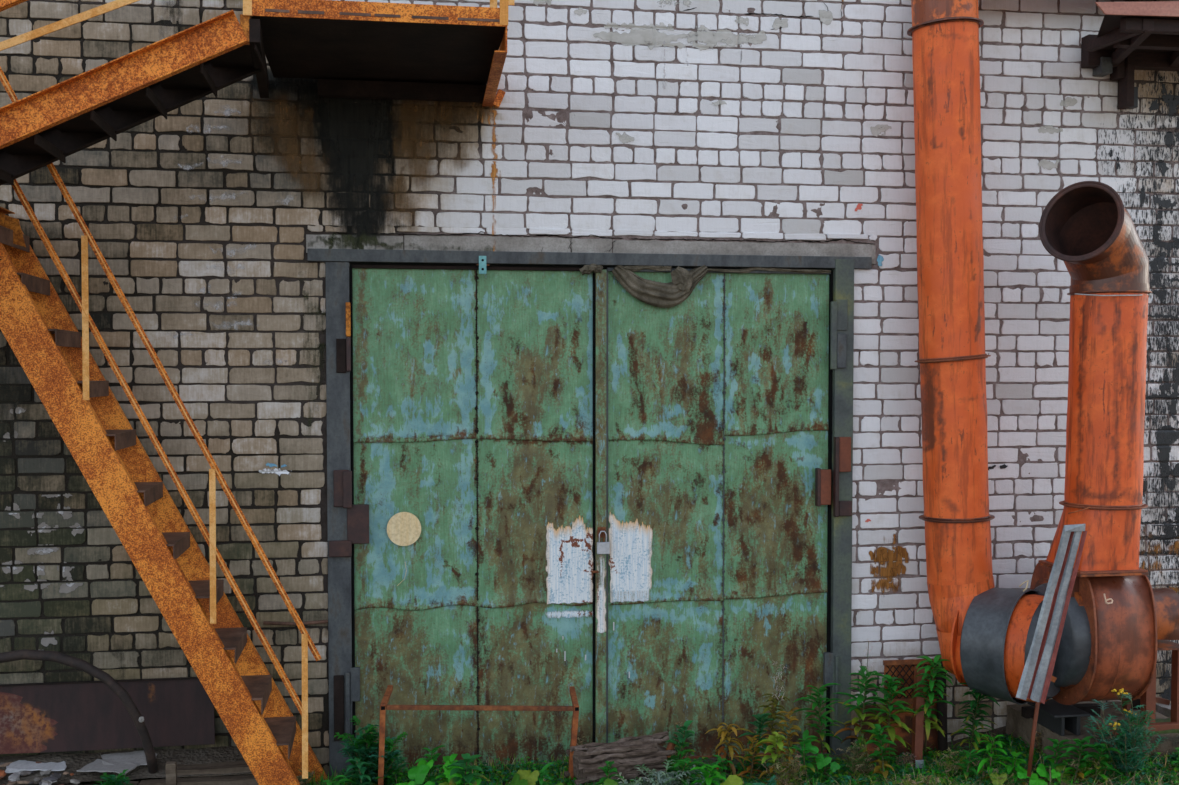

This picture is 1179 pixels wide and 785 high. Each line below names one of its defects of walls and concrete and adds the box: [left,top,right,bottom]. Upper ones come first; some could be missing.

peeling [604,22,715,50]
leakage [250,69,490,250]
leakage [1157,93,1179,182]
leakage [1153,206,1163,240]
leakage [1151,259,1167,303]
leakage [1147,337,1179,421]
leakage [1162,507,1179,545]
corrosion [869,534,909,593]